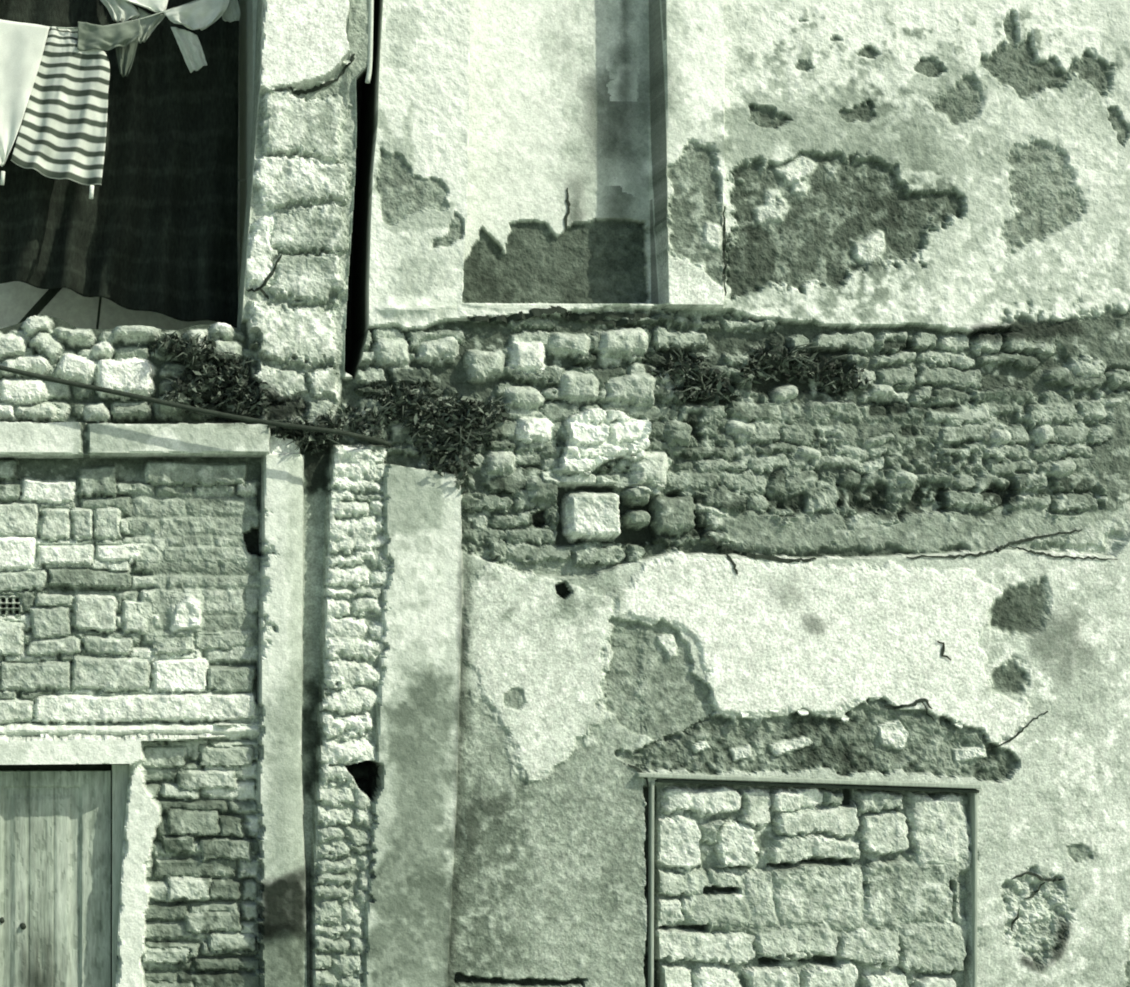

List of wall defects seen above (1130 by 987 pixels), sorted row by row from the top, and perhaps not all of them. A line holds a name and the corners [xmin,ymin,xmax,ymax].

flaking render [914,57,947,78]
flaking render [930,11,1130,146]
crack [563,188,571,232]
flaking render [375,141,966,309]
flaking render [1000,138,1086,255]
crack [704,534,817,574]
crack [906,529,1118,560]
crack [937,641,951,661]
flaking render [604,617,1022,784]